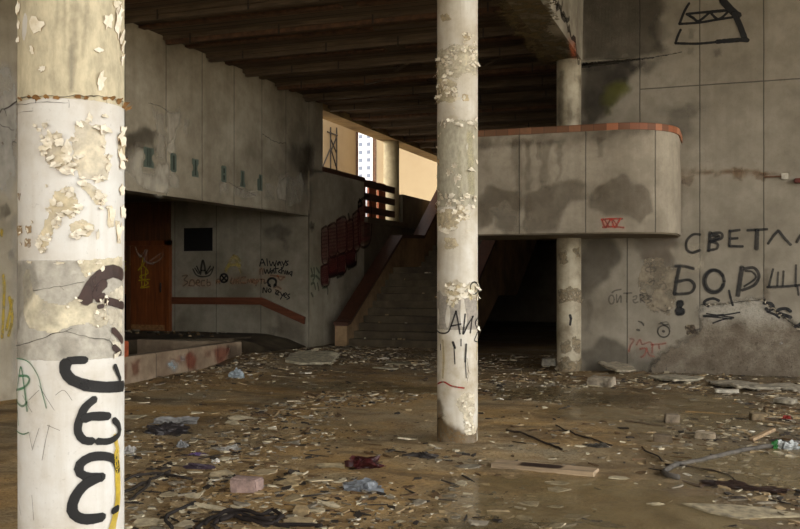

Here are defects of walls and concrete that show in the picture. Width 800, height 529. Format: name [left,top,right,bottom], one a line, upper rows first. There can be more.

peeling [15,0,132,111]
water stain [583,0,662,124]
peeling [434,32,480,250]
peeling [17,111,128,361]
crack [16,328,114,346]
peeling [435,280,481,331]
spalling [650,297,800,377]
peeling [456,393,476,435]